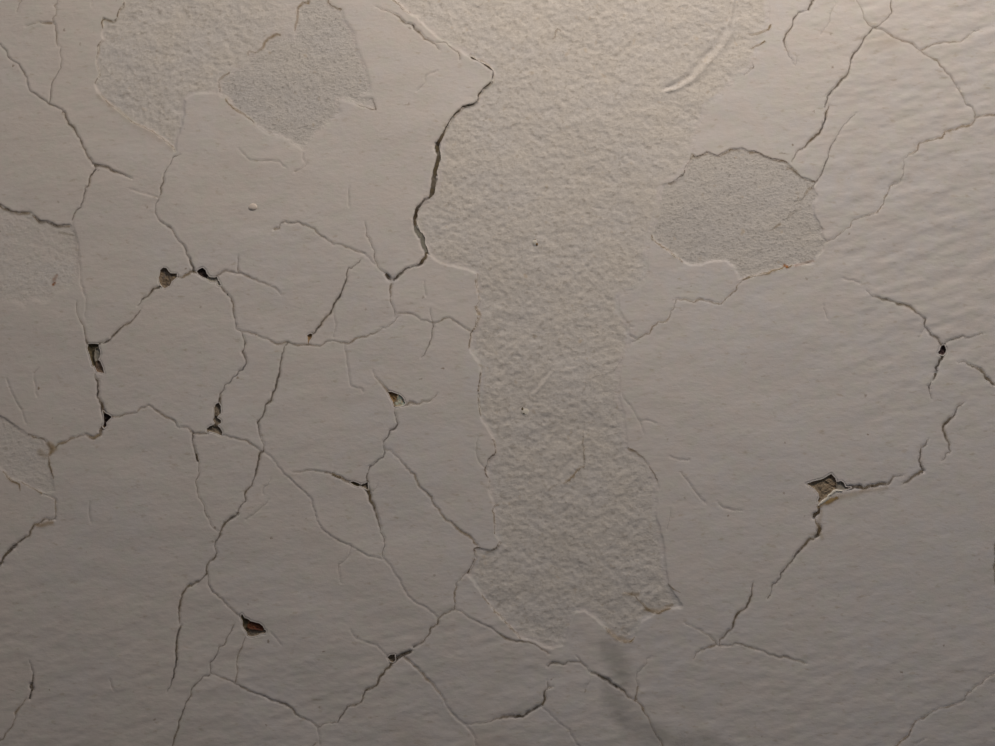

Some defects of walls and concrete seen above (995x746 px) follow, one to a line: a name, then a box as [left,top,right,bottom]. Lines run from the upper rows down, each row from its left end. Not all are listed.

peeling [95,0,375,151]
crack [807,52,855,144]
crack [385,57,493,280]
spalling [87,344,104,373]
peeling [395,0,826,648]
crack [886,299,943,387]
crack [90,379,106,439]
flaking render [807,474,848,506]
crack [847,451,923,489]
crack [783,508,821,571]
peeling [241,615,266,636]
crack [355,646,415,705]